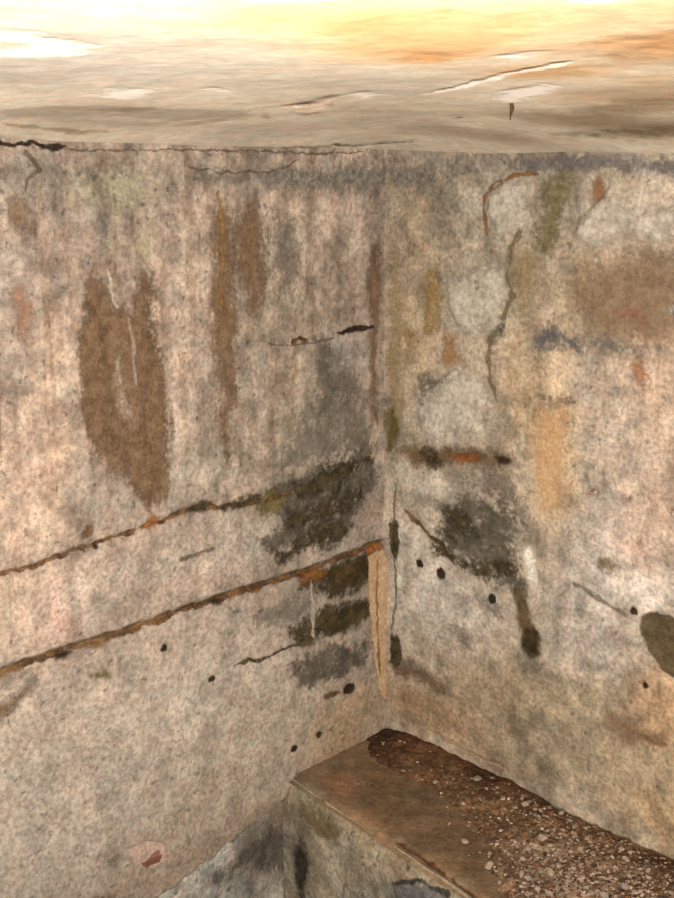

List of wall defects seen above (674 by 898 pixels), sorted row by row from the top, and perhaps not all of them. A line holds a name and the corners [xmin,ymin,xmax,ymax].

crack [0,140,413,190]
corrosion [572,127,674,138]
water stain [79,264,174,507]
water stain [209,190,267,463]
crack [269,325,374,346]
water stain [366,244,459,452]
water stain [258,443,377,566]
corrosion [401,446,511,470]
water stain [234,548,381,689]
water stain [404,493,540,657]
water stain [573,583,627,617]
water stain [640,612,674,677]